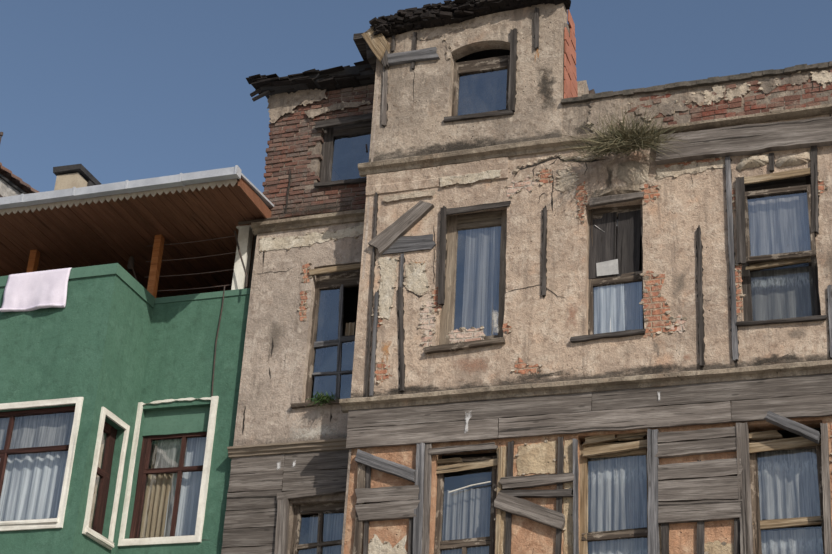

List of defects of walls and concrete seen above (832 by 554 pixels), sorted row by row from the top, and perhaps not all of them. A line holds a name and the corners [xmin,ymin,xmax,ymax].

damp [538,69,553,107]
flaking render [587,70,832,133]
crack [513,154,605,211]
crack [502,217,566,298]
spalling [298,263,312,321]
peeling [371,257,442,348]
spalling [639,271,687,338]
spalling [445,326,486,344]
spalling [374,361,392,384]
spalling [511,357,543,375]
peeling [368,534,408,554]